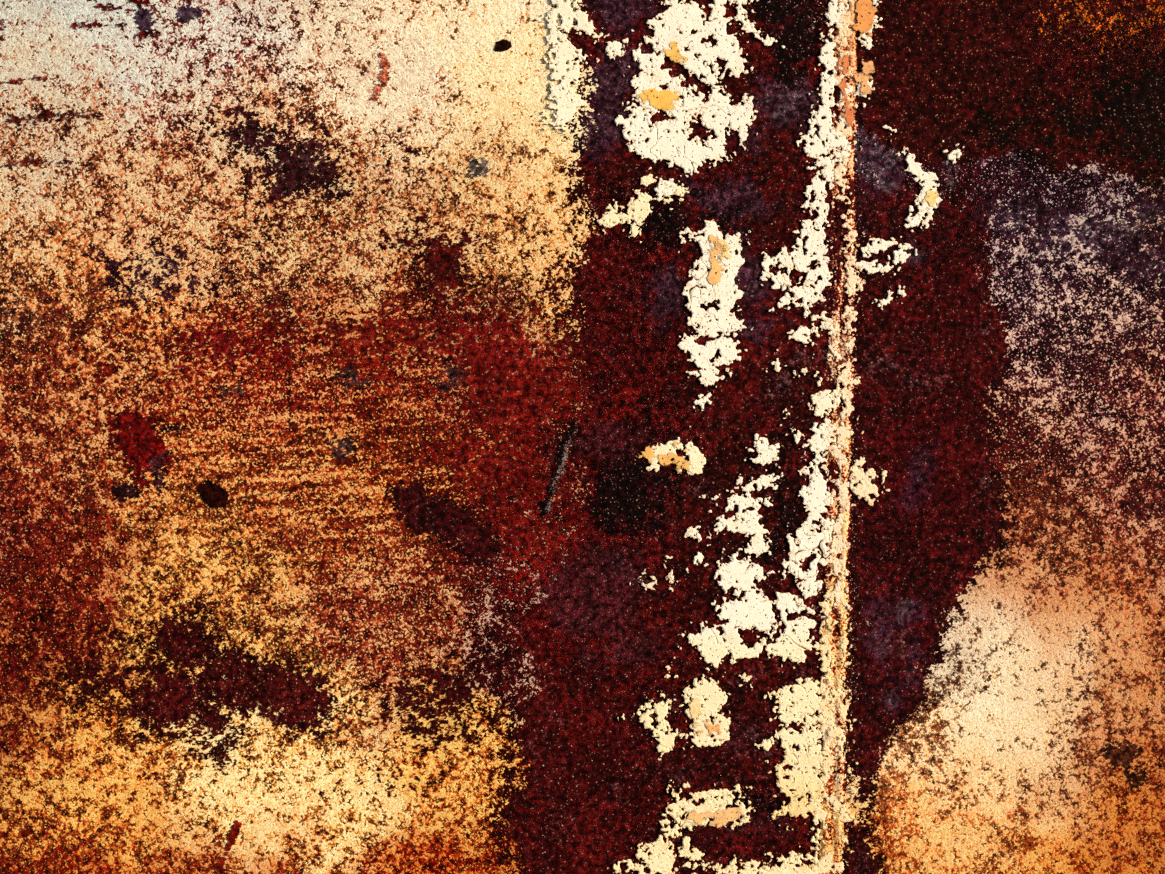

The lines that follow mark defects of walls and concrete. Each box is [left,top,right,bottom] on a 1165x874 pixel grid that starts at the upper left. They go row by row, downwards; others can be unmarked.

corrosion [0,0,835,874]
peeling [536,0,785,243]
peeling [607,0,950,874]
peeling [942,140,964,164]
corrosion [840,0,1165,874]